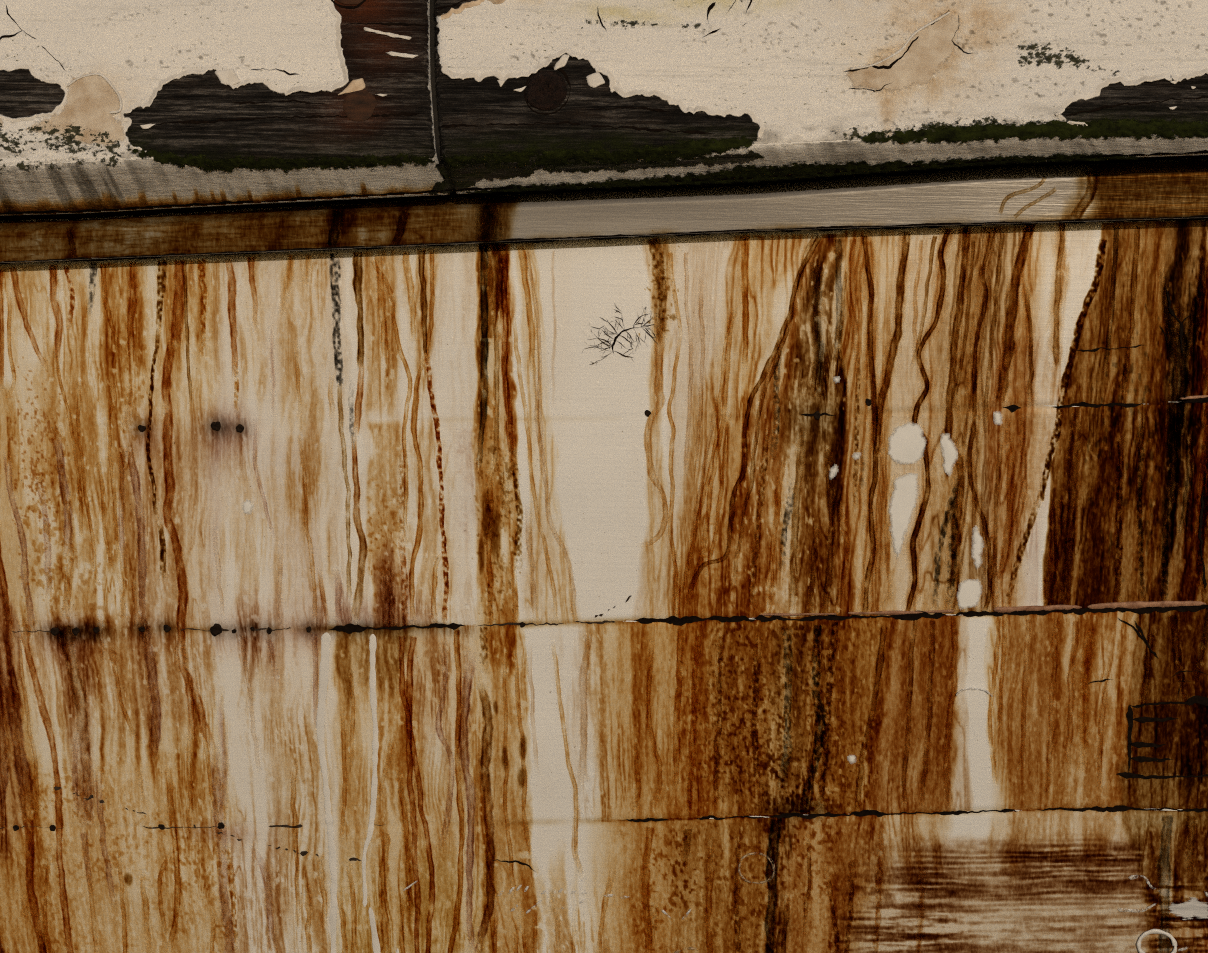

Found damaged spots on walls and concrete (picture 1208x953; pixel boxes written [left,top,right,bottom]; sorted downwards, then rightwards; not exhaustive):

peeling [0,0,765,168]
crack [843,9,970,91]
water stain [829,116,1017,145]
peeling [1055,68,1208,134]
corrosion [600,160,1208,953]